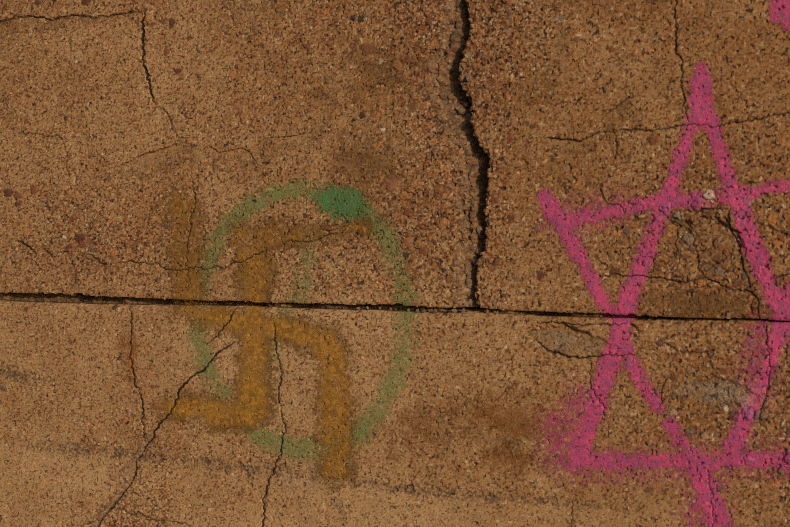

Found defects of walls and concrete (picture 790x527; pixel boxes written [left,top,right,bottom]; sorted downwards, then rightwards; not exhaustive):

crack [0,10,177,136]
crack [422,0,492,308]
crack [543,0,789,160]
crack [111,308,237,527]
crack [262,325,286,527]
crack [614,208,771,422]